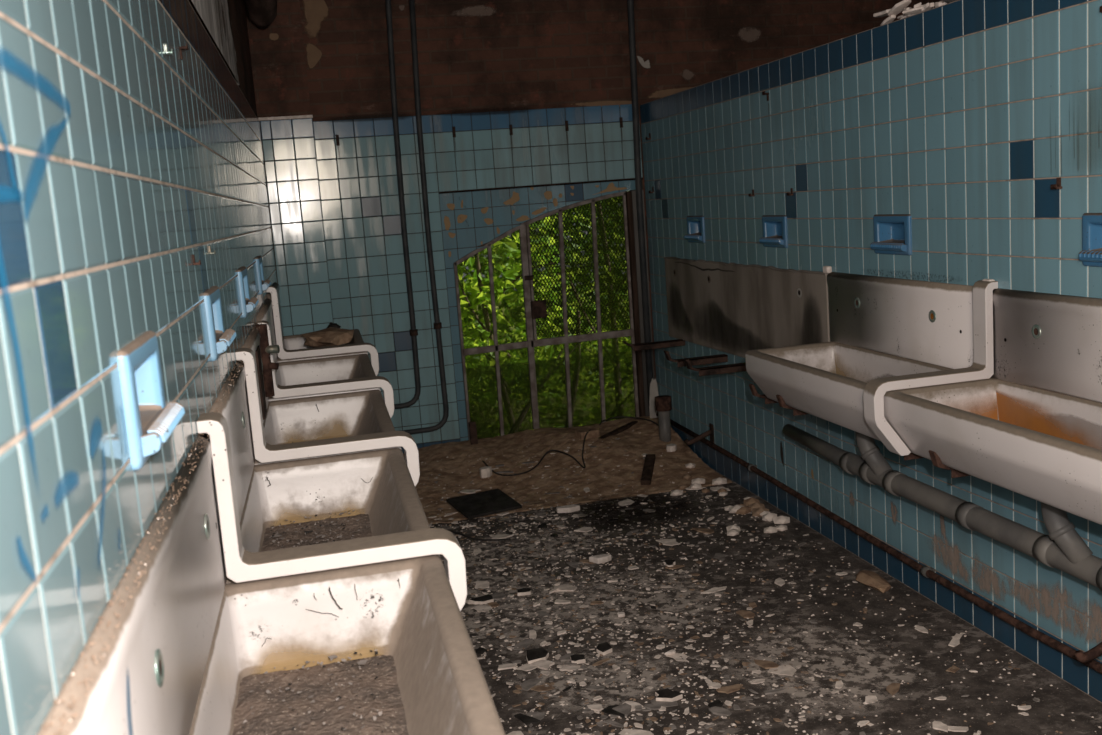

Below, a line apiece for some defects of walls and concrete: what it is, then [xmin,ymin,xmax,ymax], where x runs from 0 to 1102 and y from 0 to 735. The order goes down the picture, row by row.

peeling [303,0,328,38]
water stain [805,306,819,344]